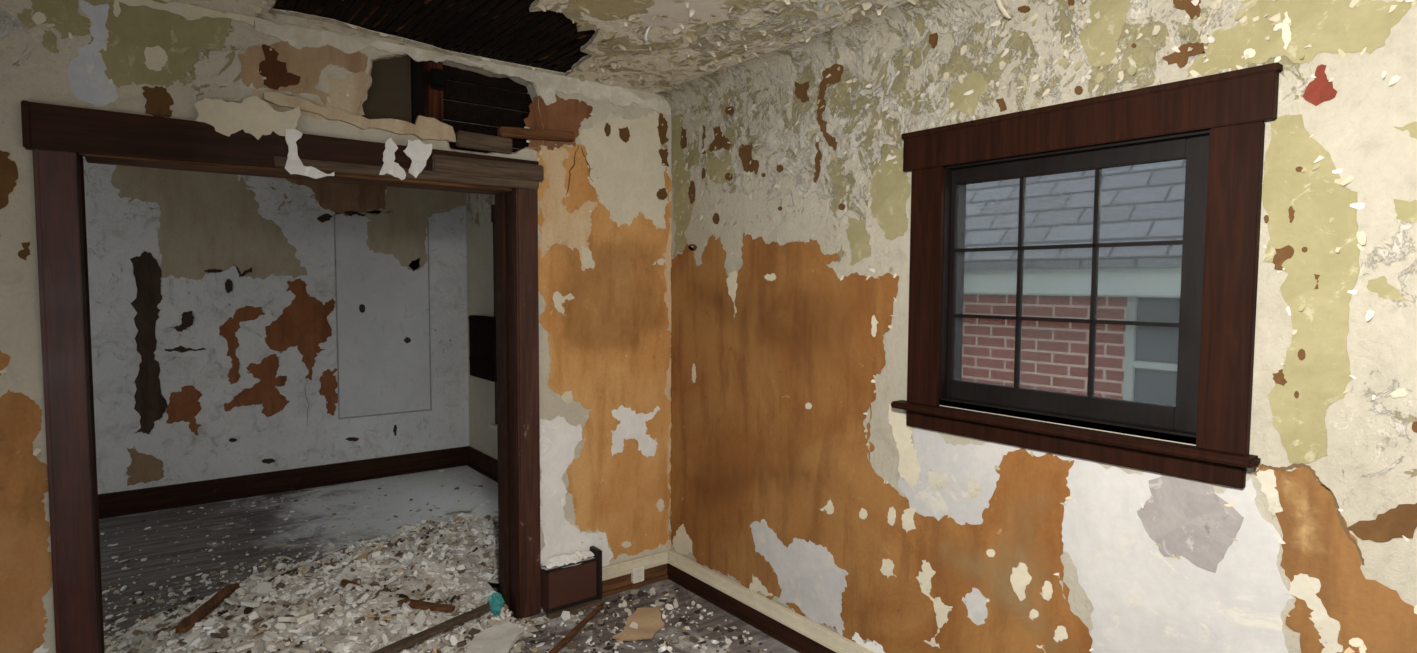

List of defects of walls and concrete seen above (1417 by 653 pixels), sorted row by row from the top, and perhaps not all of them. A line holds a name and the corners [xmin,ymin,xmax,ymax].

peeling [898,20,1024,122]
peeling [1017,0,1416,106]
flaking render [286,179,466,271]
peeling [686,149,739,204]
peeling [708,126,732,152]
peeling [736,134,765,182]
peeling [744,63,889,218]
peeling [838,147,911,266]
peeling [1394,199,1417,223]
flaking render [111,165,338,486]
peeling [1367,276,1417,302]
peeling [0,350,53,653]